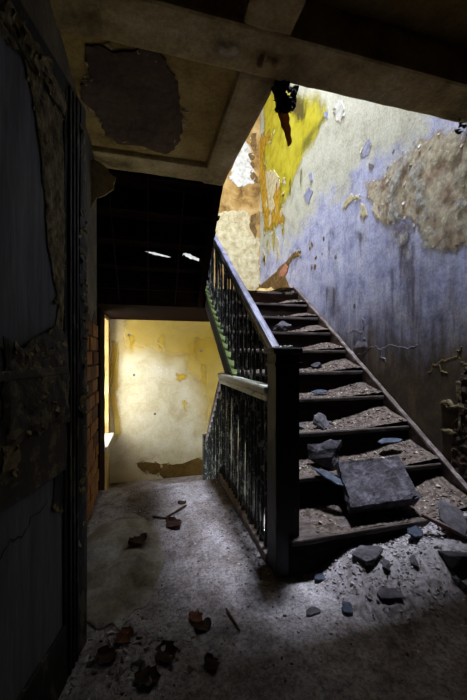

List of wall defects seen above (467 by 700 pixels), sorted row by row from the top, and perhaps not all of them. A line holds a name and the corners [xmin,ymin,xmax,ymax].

peeling [0,0,68,330]
peeling [215,98,323,292]
flaking render [342,128,467,258]
flaking render [79,42,189,598]
crack [344,318,417,361]
flaking render [136,457,202,479]